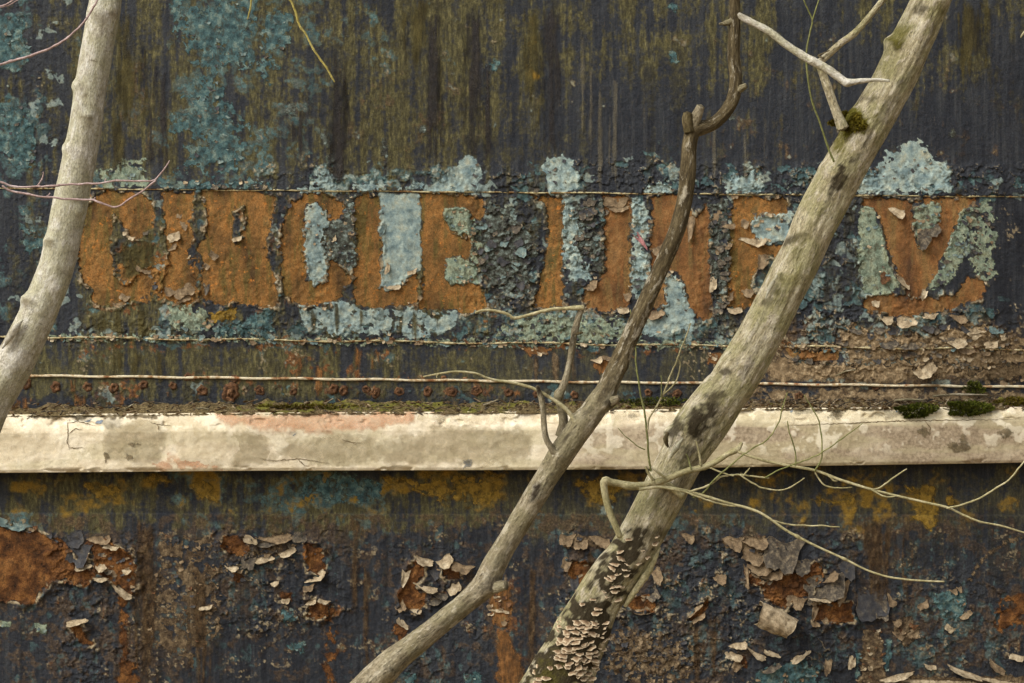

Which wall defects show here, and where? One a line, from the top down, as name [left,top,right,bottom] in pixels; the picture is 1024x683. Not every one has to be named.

peeling [47,154,675,374]
peeling [636,166,794,365]
peeling [750,138,1024,412]
rust [39,381,157,420]
peeling [0,517,137,605]
peeling [141,531,331,669]
peeling [391,553,475,640]
peeling [559,534,610,591]
peeling [713,572,727,586]
peeling [722,535,1024,683]